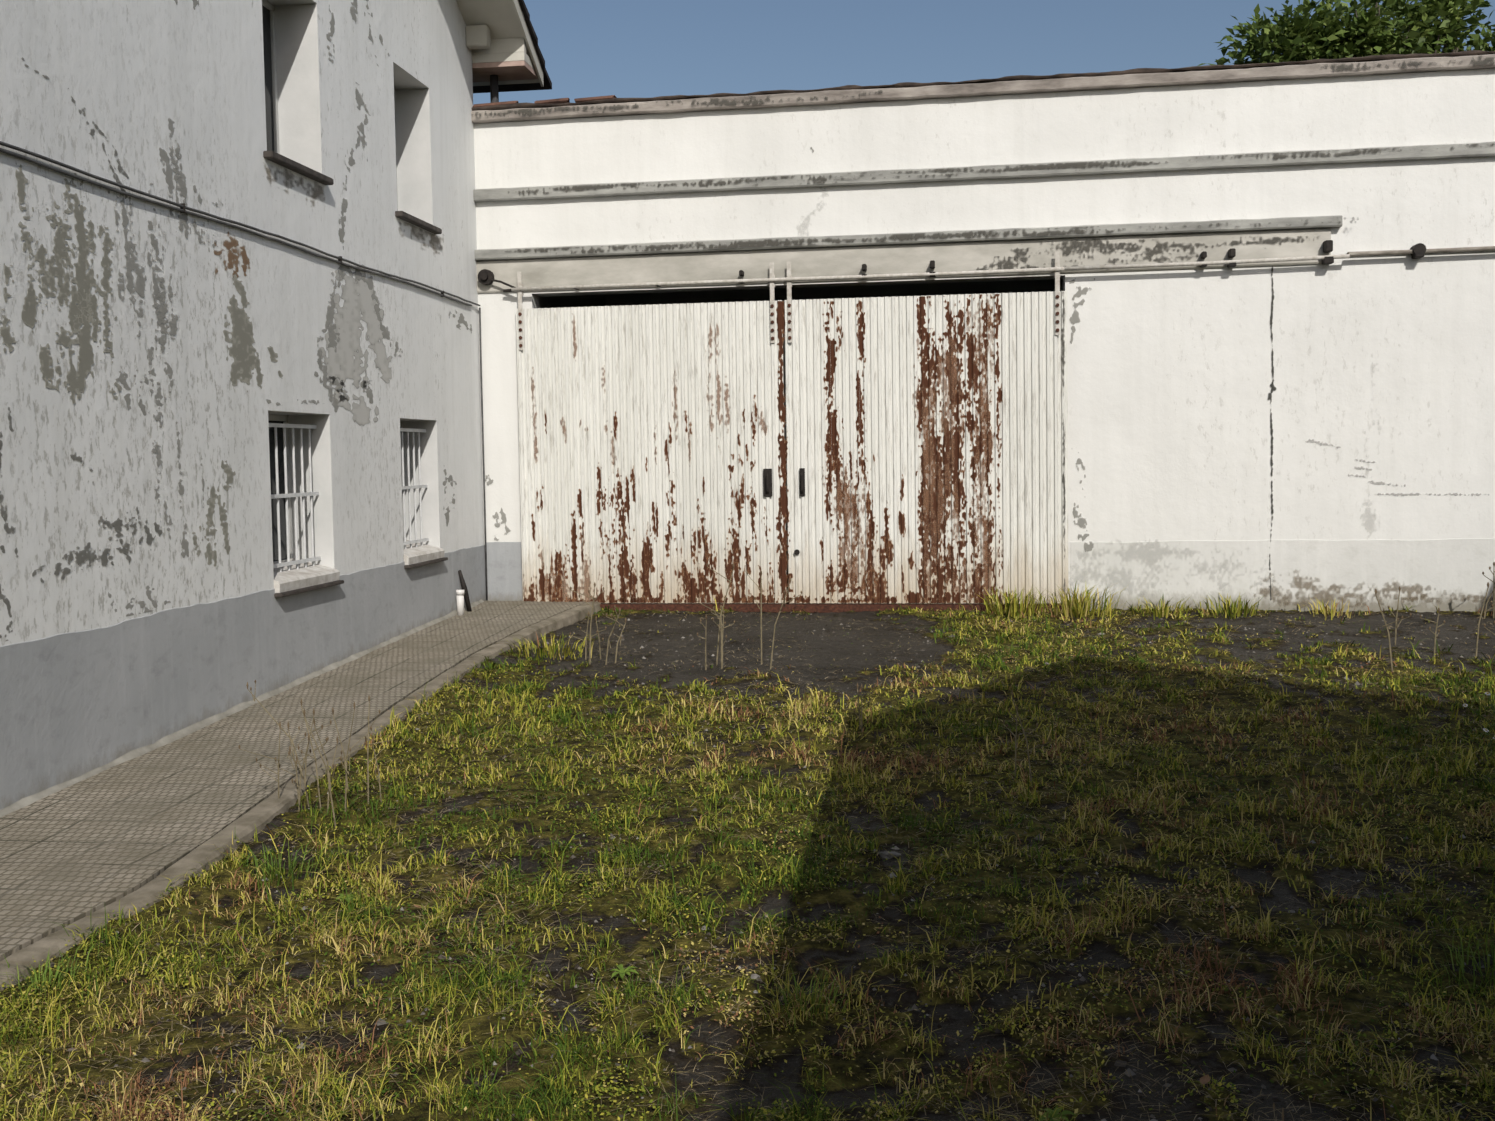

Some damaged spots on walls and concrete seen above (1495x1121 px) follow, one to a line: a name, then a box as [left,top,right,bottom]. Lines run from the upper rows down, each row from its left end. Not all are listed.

peeling [0,118,403,583]
rust [523,294,1020,603]
crack [1268,266,1481,600]